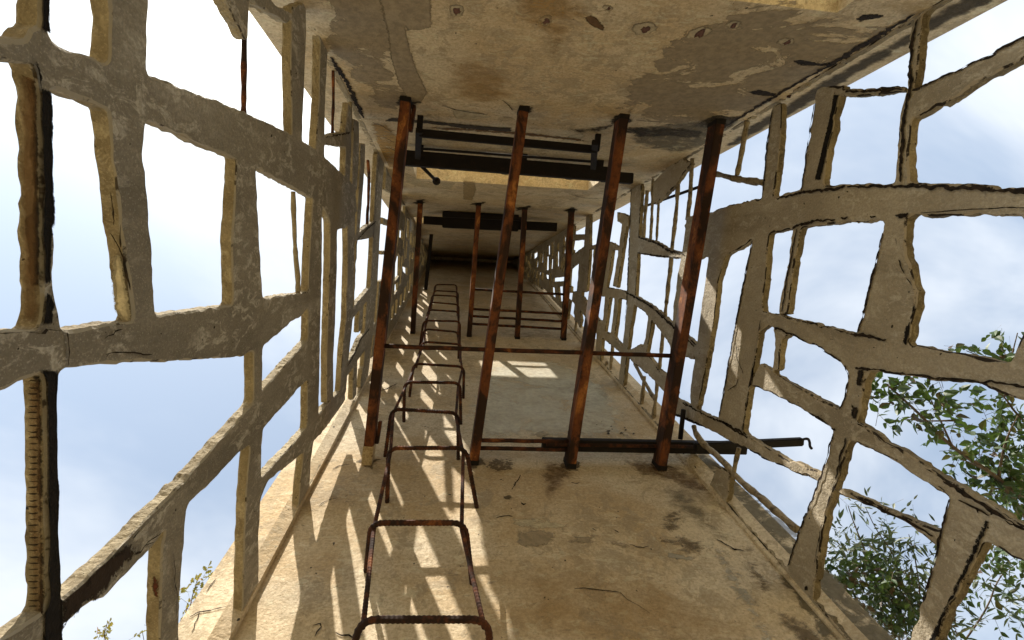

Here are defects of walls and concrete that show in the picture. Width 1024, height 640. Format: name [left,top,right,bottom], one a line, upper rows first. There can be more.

peeling [615,1,887,186]
crack [106,329,152,358]
spalling [33,370,136,640]